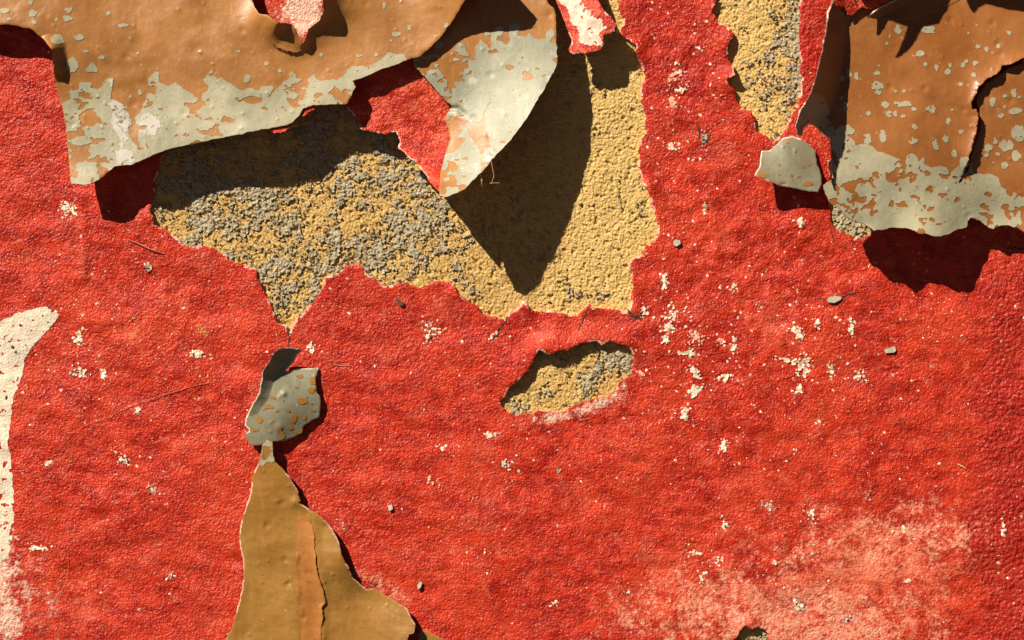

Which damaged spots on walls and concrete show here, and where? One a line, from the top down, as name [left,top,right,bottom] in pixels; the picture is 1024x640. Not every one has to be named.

spalling [0,0,750,421]
peeling [712,0,1024,239]
peeling [226,341,443,640]